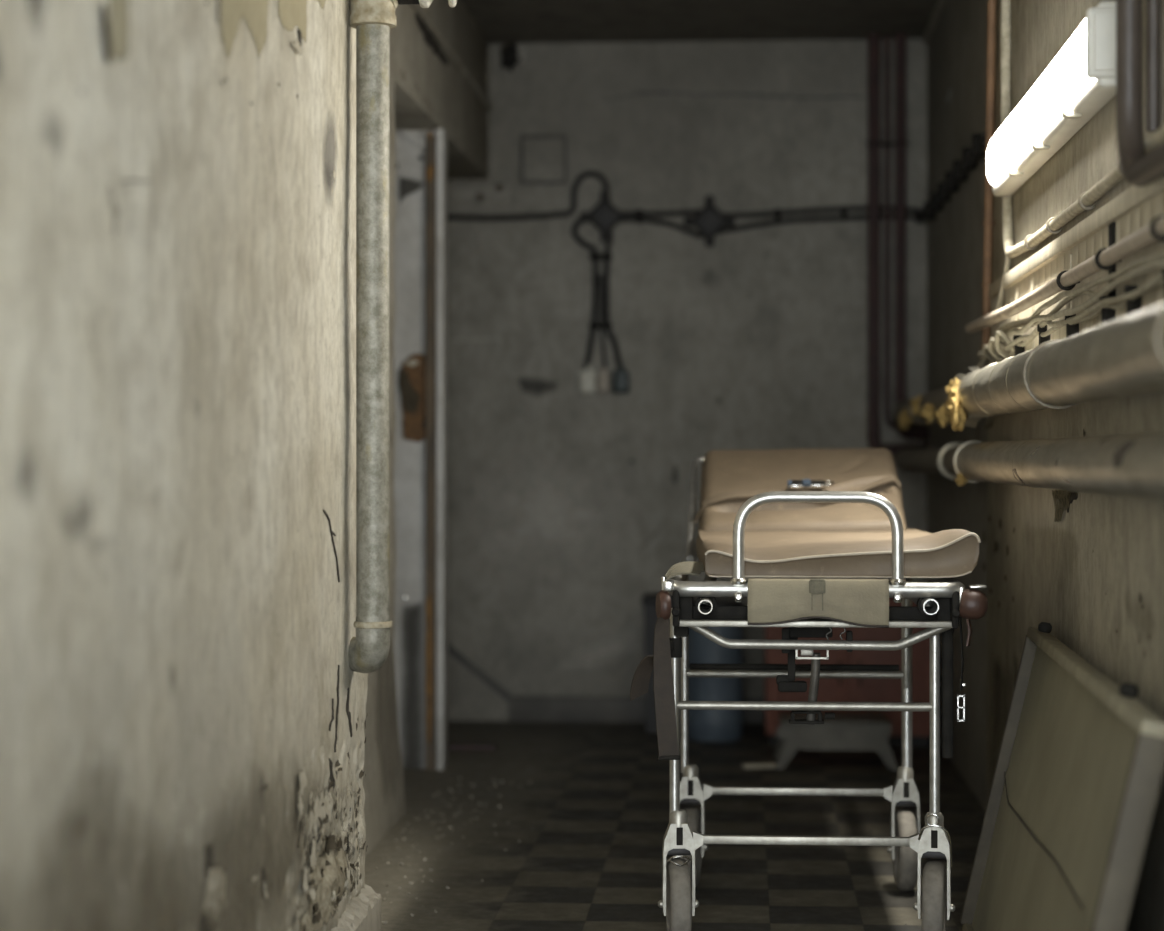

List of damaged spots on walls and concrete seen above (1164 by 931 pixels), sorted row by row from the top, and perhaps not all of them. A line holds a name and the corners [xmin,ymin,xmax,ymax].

peeling [205,0,326,58]
peeling [1052,490,1079,522]
crack [323,510,340,582]
crack [329,665,352,791]
spalling [287,752,368,931]